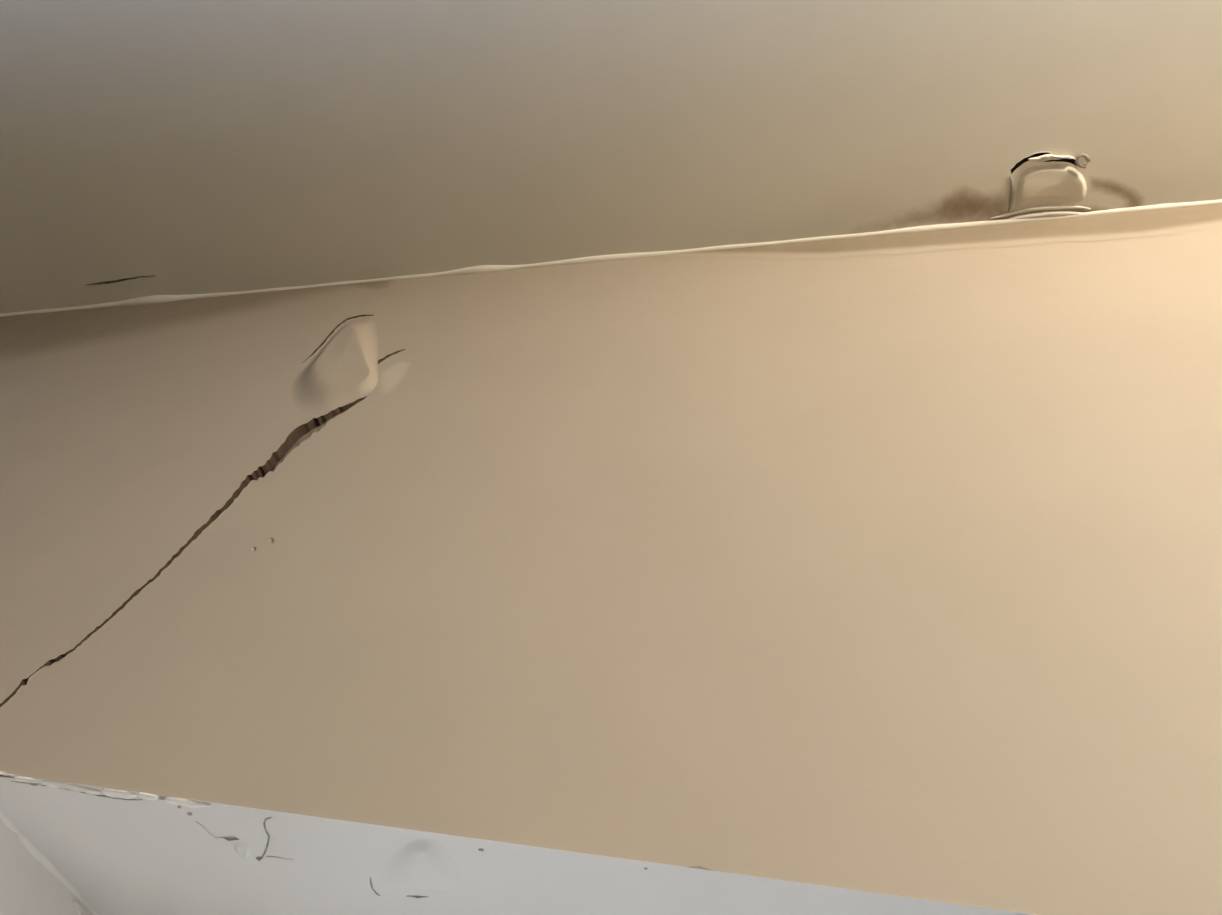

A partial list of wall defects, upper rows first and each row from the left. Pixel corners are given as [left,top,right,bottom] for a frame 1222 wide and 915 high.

water stain [650,163,1222,260]
crack [0,396,367,709]